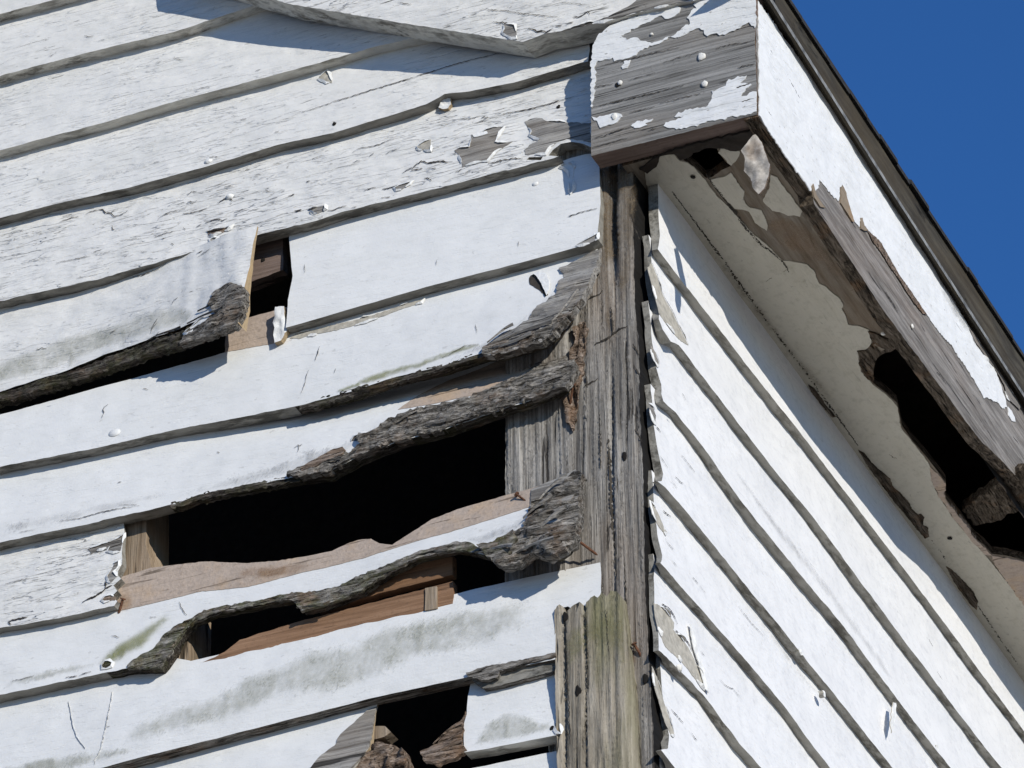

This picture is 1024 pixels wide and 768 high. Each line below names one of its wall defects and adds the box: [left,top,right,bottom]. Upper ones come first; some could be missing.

peeling [454,125,513,167]
peeling [524,118,591,156]
spalling [249,255,293,317]
peeling [647,263,688,345]
peeling [868,231,927,315]
spalling [0,336,226,414]
spalling [169,418,506,565]
hole [874,349,1024,552]
spalling [344,554,505,610]
spalling [211,604,322,656]
peeling [654,603,709,693]
spalling [375,685,549,768]